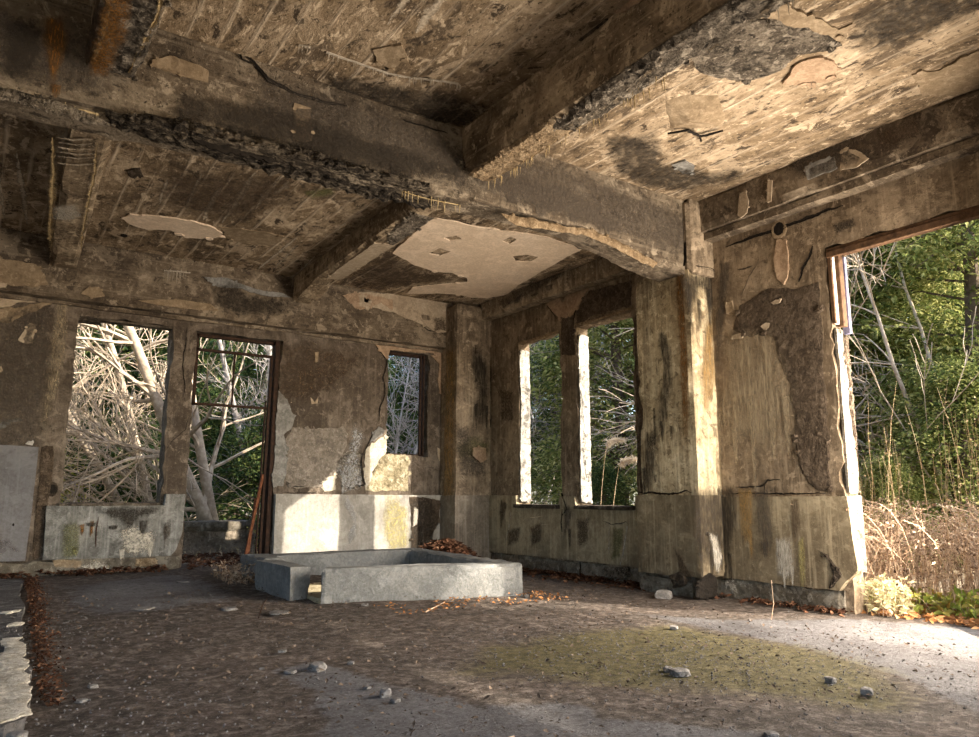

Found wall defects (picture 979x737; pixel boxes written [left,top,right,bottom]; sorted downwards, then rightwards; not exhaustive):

crack [238,54,346,107]
spalling [468,0,852,181]
crack [667,129,723,142]
crack [683,242,714,271]
crack [726,205,843,293]
spalling [271,390,441,548]
leakage [642,332,672,493]
crack [639,488,692,496]
leakage [676,262,805,592]
crack [733,479,825,495]